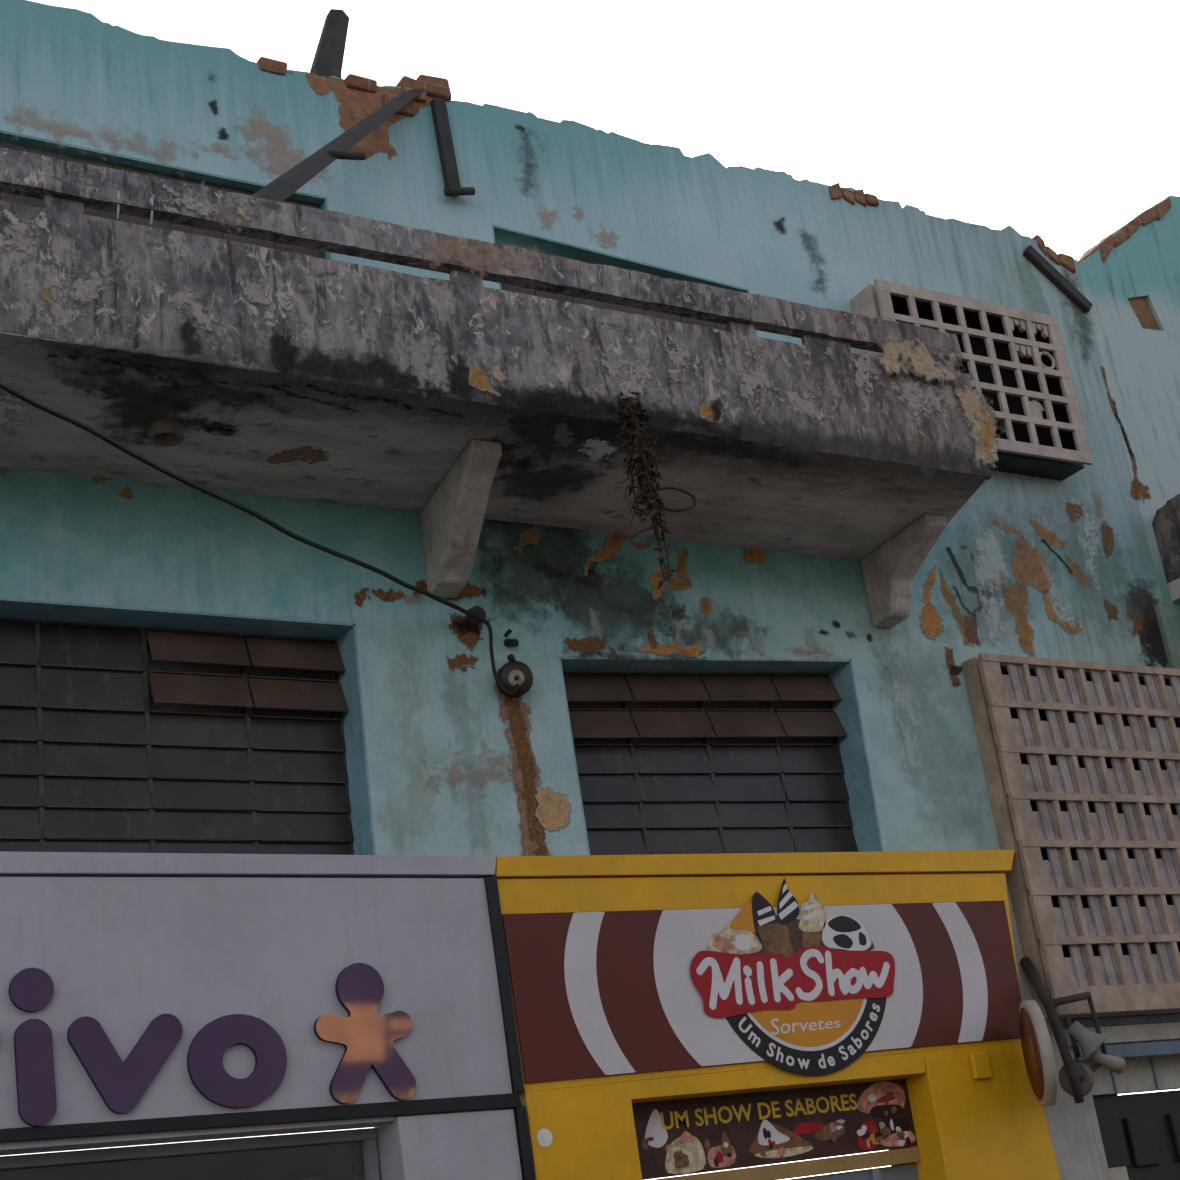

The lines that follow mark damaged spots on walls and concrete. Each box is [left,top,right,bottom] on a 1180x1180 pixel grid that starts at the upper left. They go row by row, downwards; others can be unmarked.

flaking render [257,57,292,76]
flaking render [305,72,452,160]
flaking render [1032,198,1171,273]
damp [271,328,473,404]
damp [487,336,988,500]
peeling [354,580,427,607]
flaking render [447,584,491,672]
damp [479,519,763,656]
damp [806,621,872,648]
peeling [919,566,973,646]
peeling [992,518,1092,657]
rust [495,684,549,856]